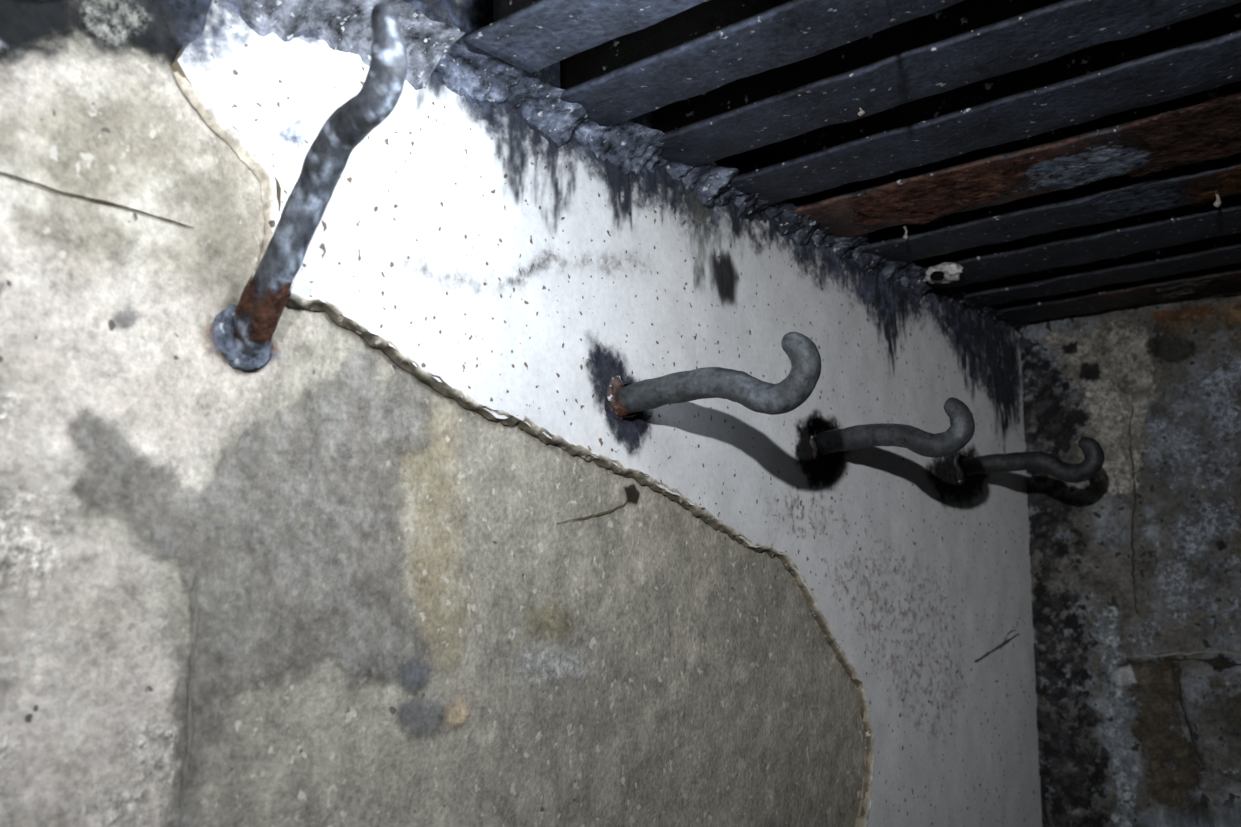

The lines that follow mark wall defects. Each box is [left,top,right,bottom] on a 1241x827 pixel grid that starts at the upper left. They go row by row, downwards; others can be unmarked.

water stain [428,71,445,96]
water stain [489,103,575,223]
water stain [605,158,677,225]
water stain [728,200,751,237]
spalling [0,0,875,827]
water stain [857,268,908,370]
water stain [935,293,1101,460]
water stain [1145,333,1195,363]
water stain [0,484,74,612]
water stain [69,352,469,827]
water stain [1026,352,1241,827]
crack [1117,651,1241,772]